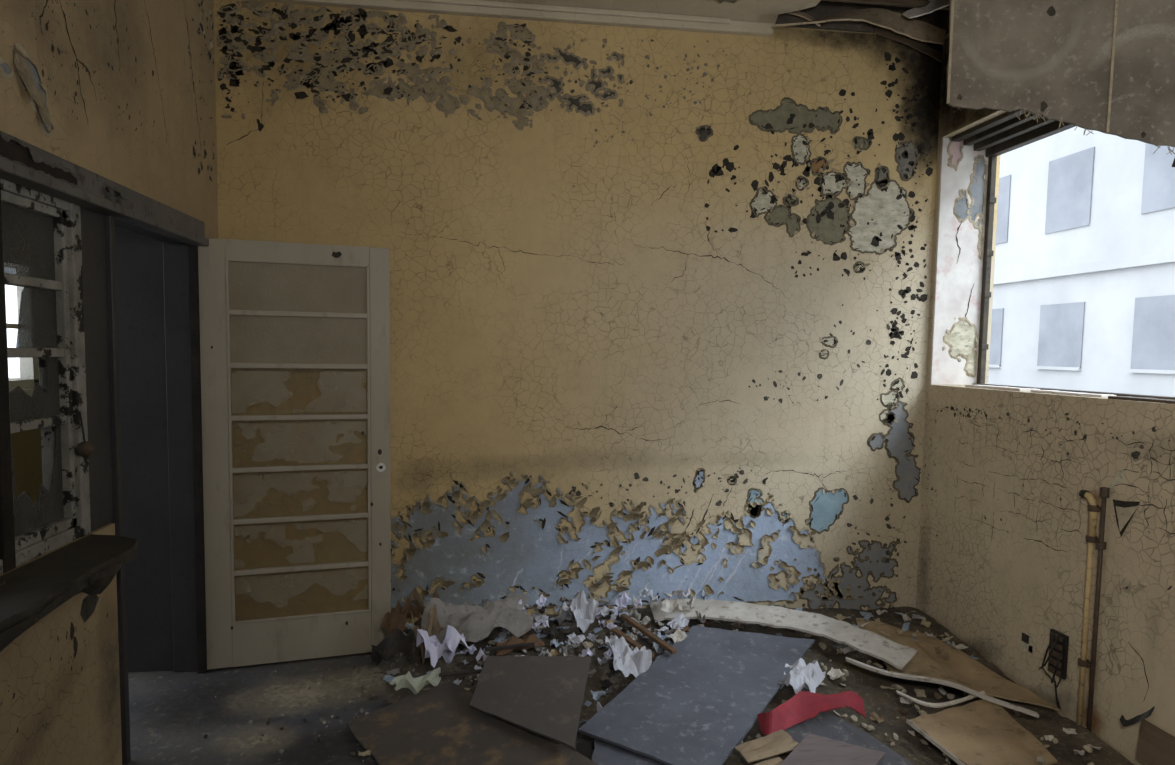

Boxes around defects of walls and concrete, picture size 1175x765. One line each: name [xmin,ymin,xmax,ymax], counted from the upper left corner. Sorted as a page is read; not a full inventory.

peeling [0,0,113,137]
mould [217,3,462,112]
mould [495,23,537,109]
peeling [0,131,79,188]
peeling [391,51,988,612]
crack [955,418,1086,552]
crack [1115,439,1175,537]
crack [1128,642,1149,700]